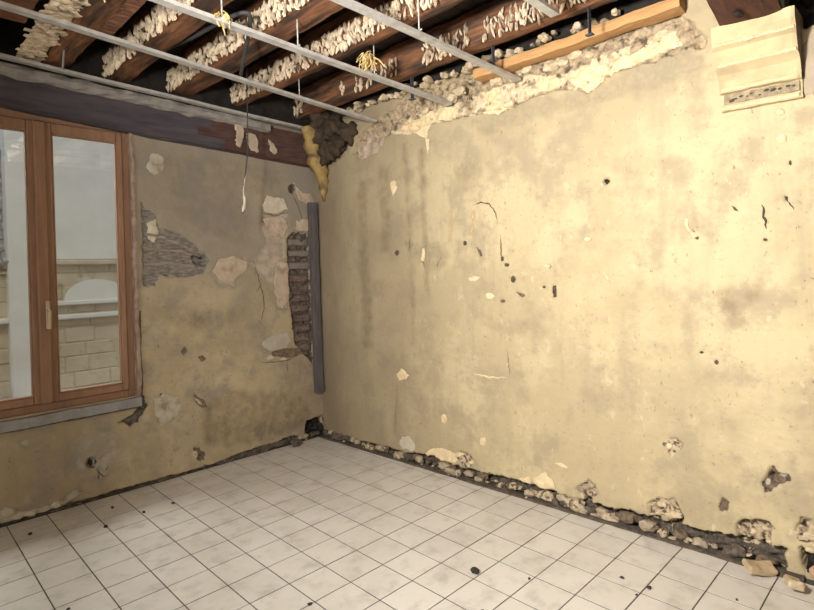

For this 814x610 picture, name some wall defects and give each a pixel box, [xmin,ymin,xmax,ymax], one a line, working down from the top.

flaking render [141,182,315,370]
flaking render [118,393,181,427]
flaking render [0,416,814,583]